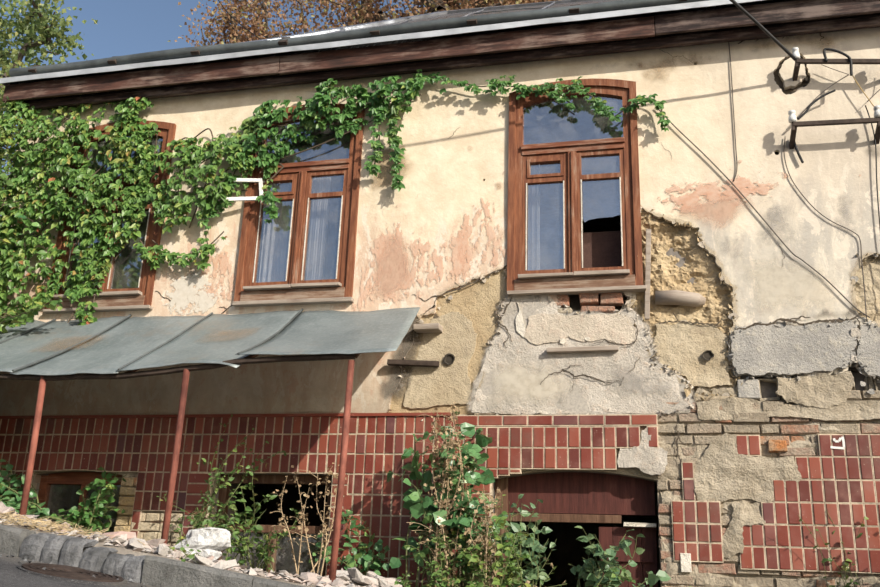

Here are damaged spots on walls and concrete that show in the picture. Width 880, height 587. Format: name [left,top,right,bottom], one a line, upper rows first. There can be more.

crack [413,265,507,315]
flaking render [352,172,794,422]
flaking render [850,253,880,326]
crack [495,298,512,348]
flaking render [768,439,788,453]